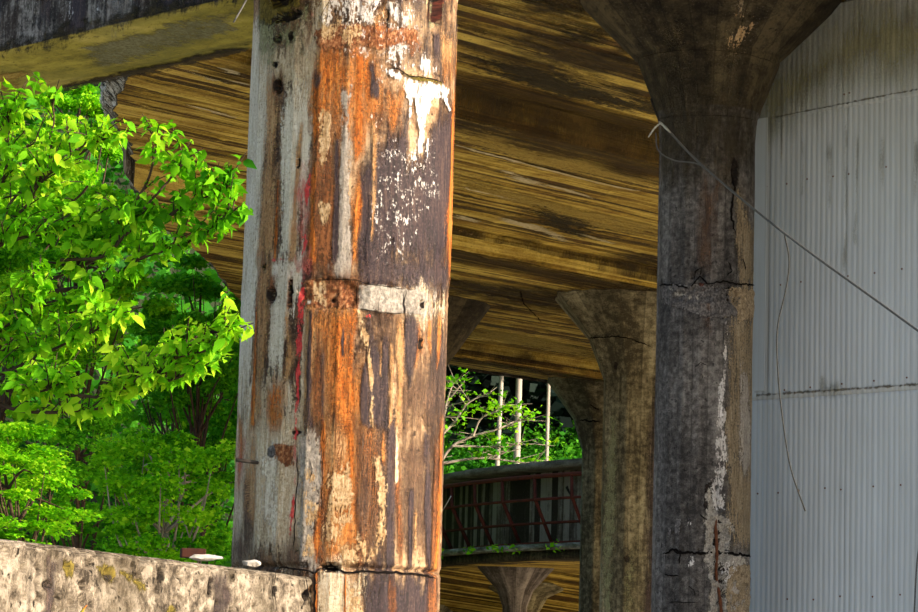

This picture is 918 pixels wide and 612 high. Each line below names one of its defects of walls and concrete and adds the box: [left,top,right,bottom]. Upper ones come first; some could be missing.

corrosion [238,77,294,528]
spalling [234,0,445,612]
corrosion [289,45,404,273]
corrosion [303,306,403,566]
crack [274,426,436,612]
damp [289,0,764,612]
crack [659,259,755,288]
crack [663,548,751,603]
spalling [660,283,755,323]
crack [729,157,737,233]
damp [756,383,917,396]